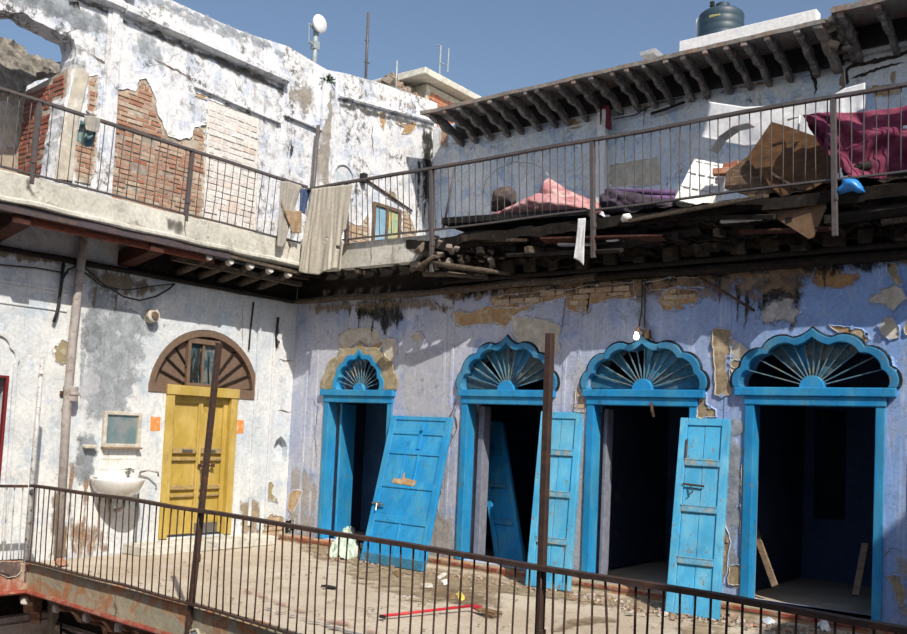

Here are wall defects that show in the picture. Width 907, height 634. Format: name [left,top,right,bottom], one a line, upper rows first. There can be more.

crack [845,50,907,85]
flaking render [0,75,65,178]
flaking render [112,77,258,233]
water stain [318,90,433,217]
flaking render [338,326,399,365]
peeling [450,276,705,357]
water stain [315,260,907,336]
flaking render [696,327,751,419]
flaking render [827,261,907,344]
flaking render [722,463,743,587]
flaking render [886,573,907,609]